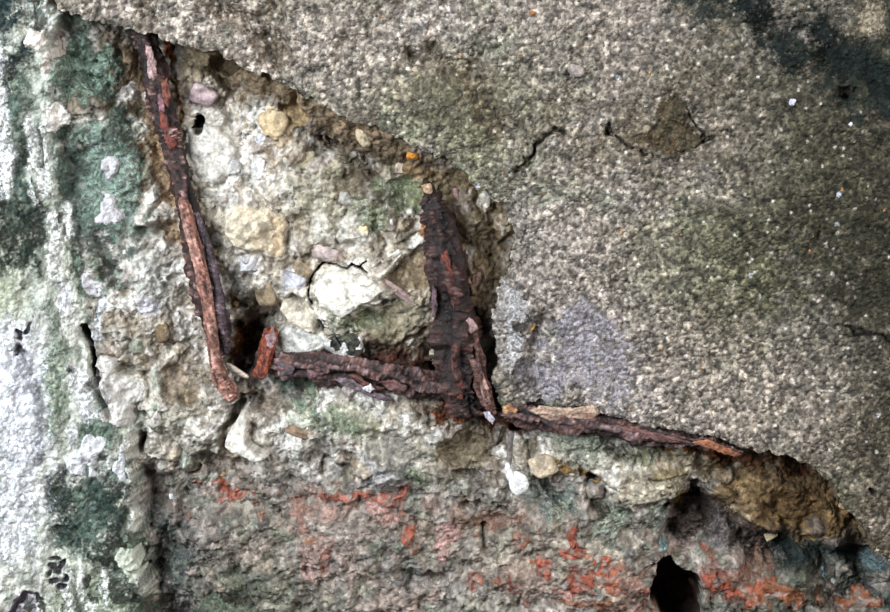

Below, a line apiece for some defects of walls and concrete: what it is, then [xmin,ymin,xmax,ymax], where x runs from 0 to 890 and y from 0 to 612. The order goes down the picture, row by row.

leakage [734,0,890,99]
rust [164,41,184,134]
crack [605,123,669,161]
spalling [23,12,744,458]
crack [82,323,98,377]
rust [227,290,254,355]
rust [371,349,434,370]
rust [415,400,529,435]
flaking render [192,477,264,523]
flaking render [288,484,417,585]